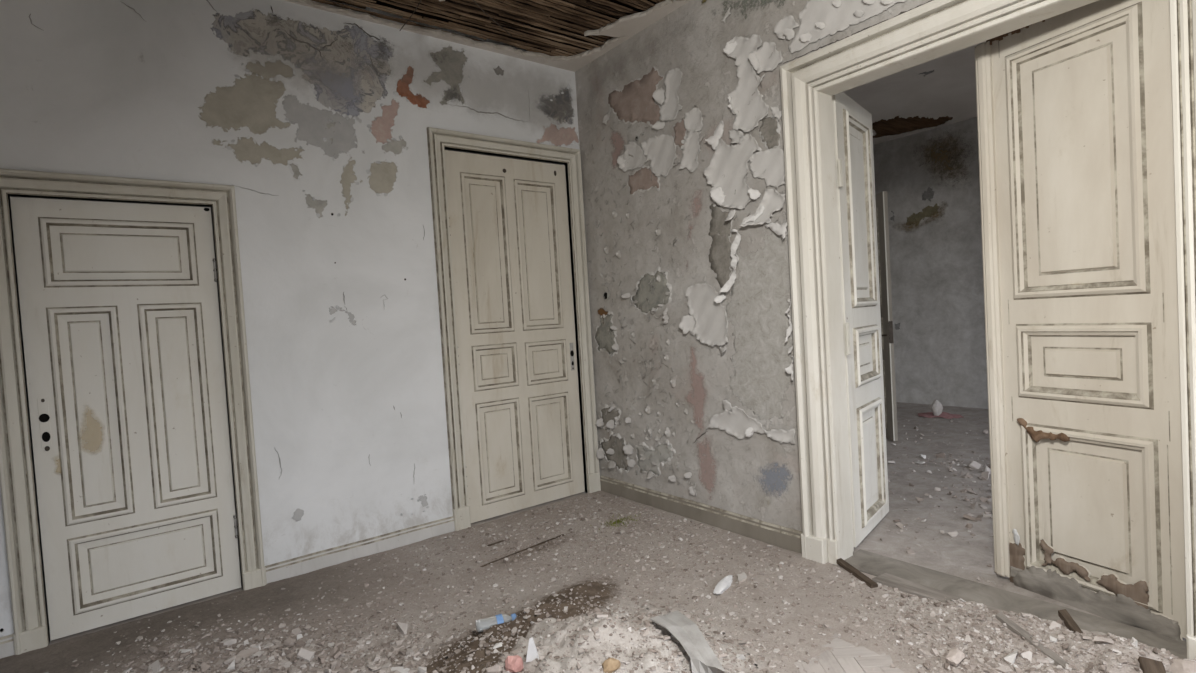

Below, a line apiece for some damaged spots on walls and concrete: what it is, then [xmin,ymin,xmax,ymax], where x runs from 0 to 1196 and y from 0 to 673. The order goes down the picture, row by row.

peeling [198,0,687,218]
peeling [536,0,906,497]
peeling [872,115,958,139]
peeling [890,187,940,226]